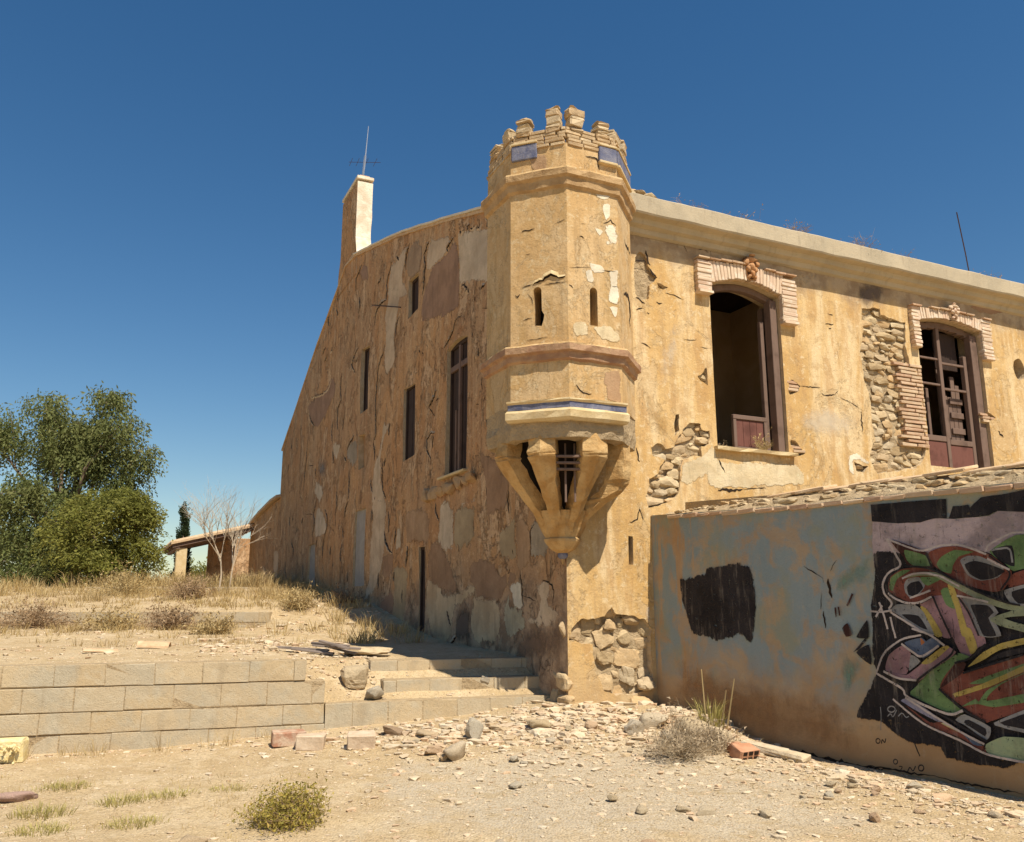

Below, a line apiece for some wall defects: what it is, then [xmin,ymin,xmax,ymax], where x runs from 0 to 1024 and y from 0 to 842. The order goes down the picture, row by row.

flaking render [595,194,618,244]
flaking render [384,228,487,374]
flaking render [573,263,620,342]
crack [516,220,684,341]
flaking render [634,253,665,300]
crack [806,386,863,431]
flaking render [849,309,924,474]
flaking render [364,422,401,600]
flaking render [438,453,508,551]
flaking render [646,424,805,508]
flaking render [426,518,649,694]
crack [805,561,836,628]